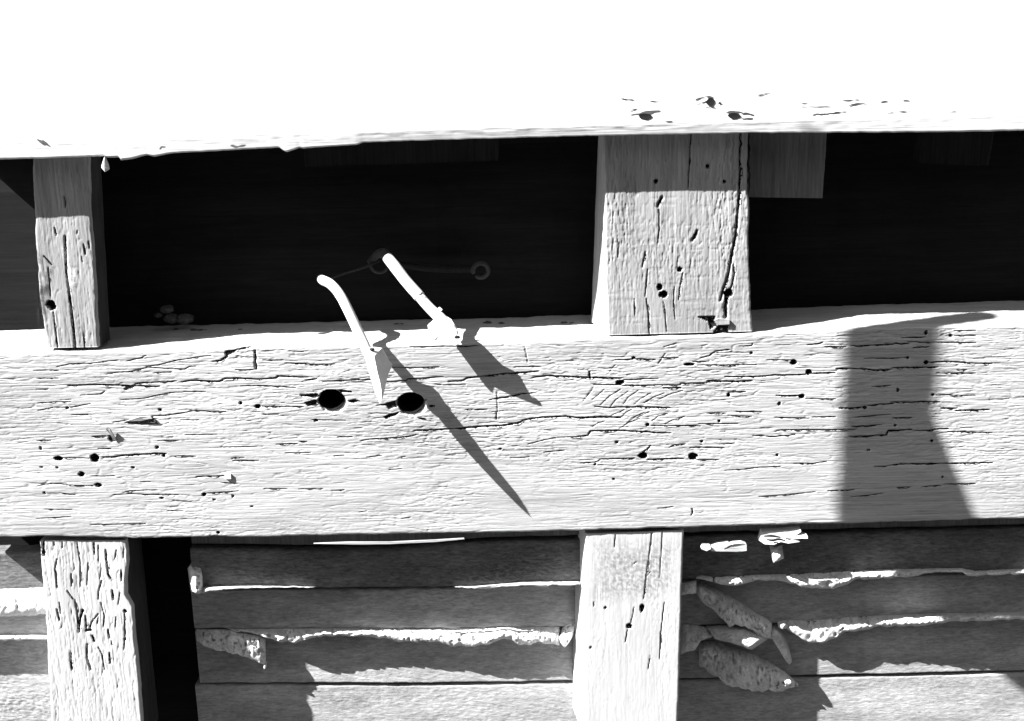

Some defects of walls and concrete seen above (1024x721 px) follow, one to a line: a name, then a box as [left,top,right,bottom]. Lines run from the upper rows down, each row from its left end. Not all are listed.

crack [695,92,770,316]
crack [35,197,992,497]
crack [38,481,180,670]
crack [625,534,665,670]